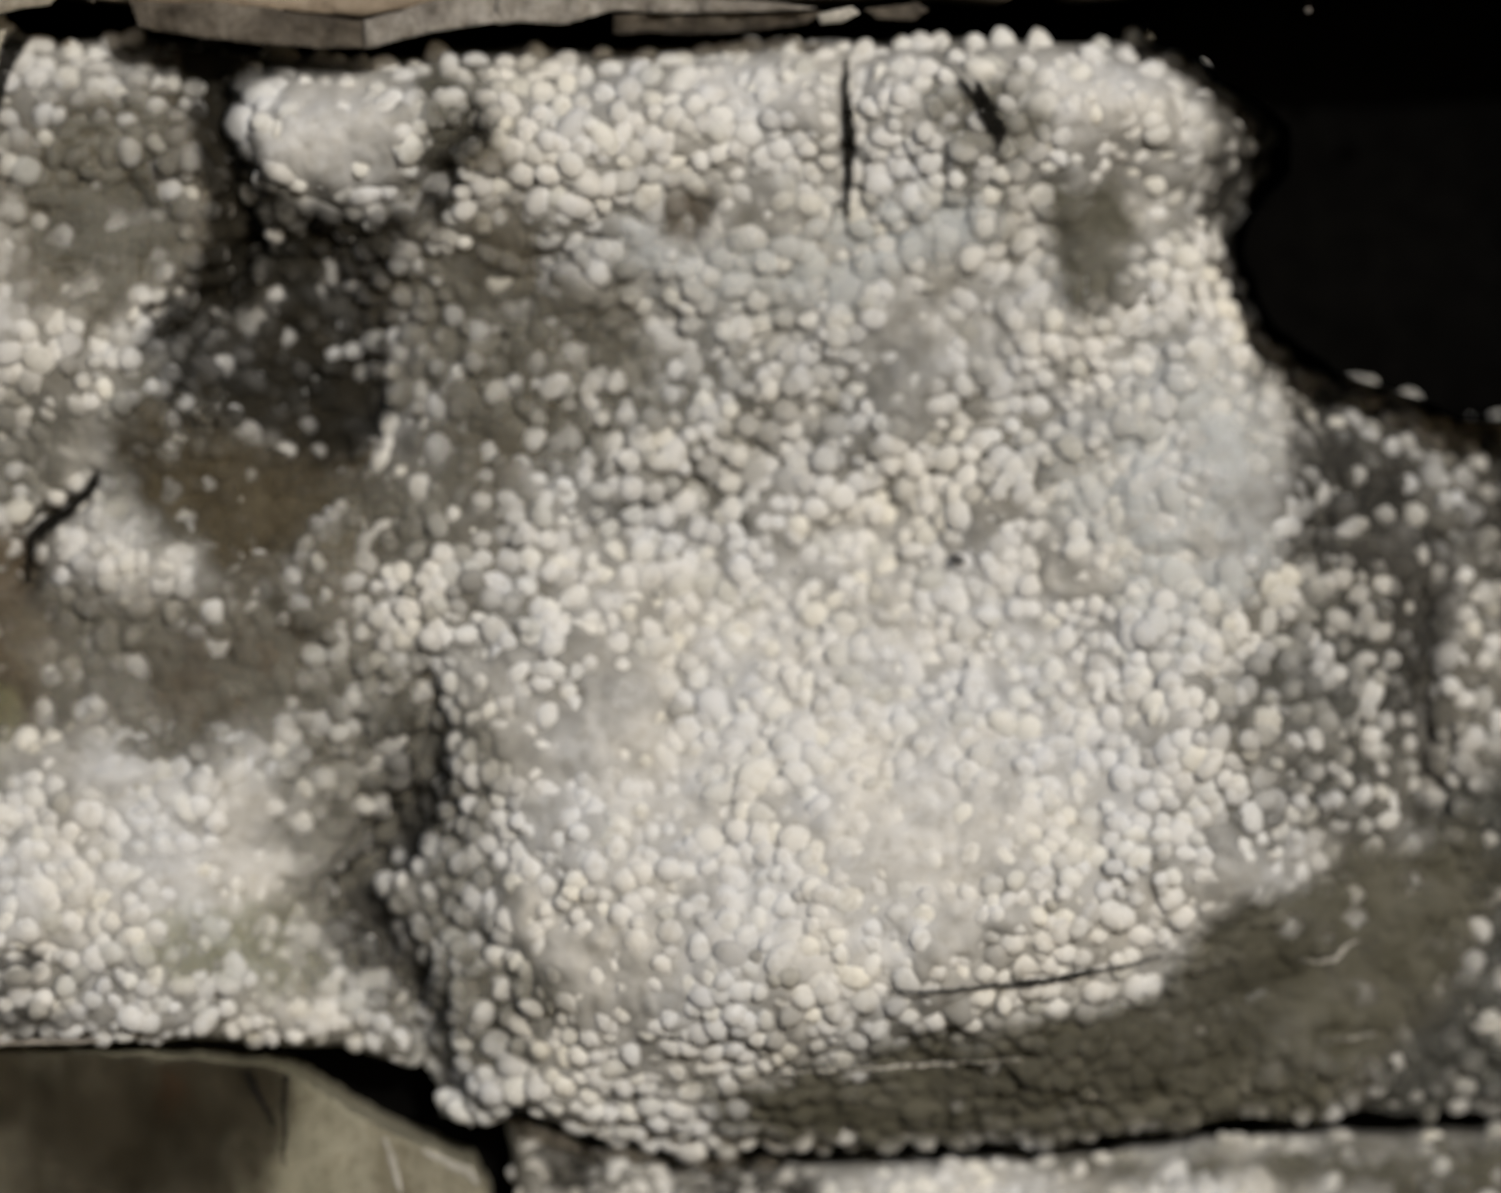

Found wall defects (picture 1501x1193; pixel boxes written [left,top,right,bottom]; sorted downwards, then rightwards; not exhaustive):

spalling [958,78,1008,152]
leakage [0,41,653,1053]
spalling [950,553,964,565]